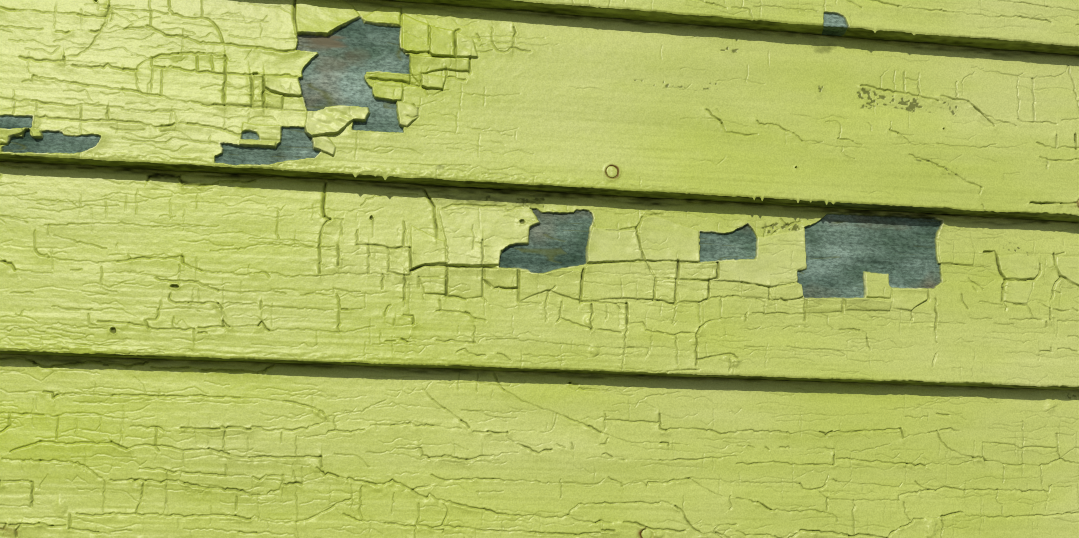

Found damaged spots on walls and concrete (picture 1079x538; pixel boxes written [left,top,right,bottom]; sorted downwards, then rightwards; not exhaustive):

peeling [0,114,101,154]
peeling [214,0,478,165]
crack [351,5,532,135]
peeling [821,12,849,36]
crack [691,0,1079,26]
crack [705,64,1079,211]
peeling [411,206,975,313]
crack [0,144,1079,538]